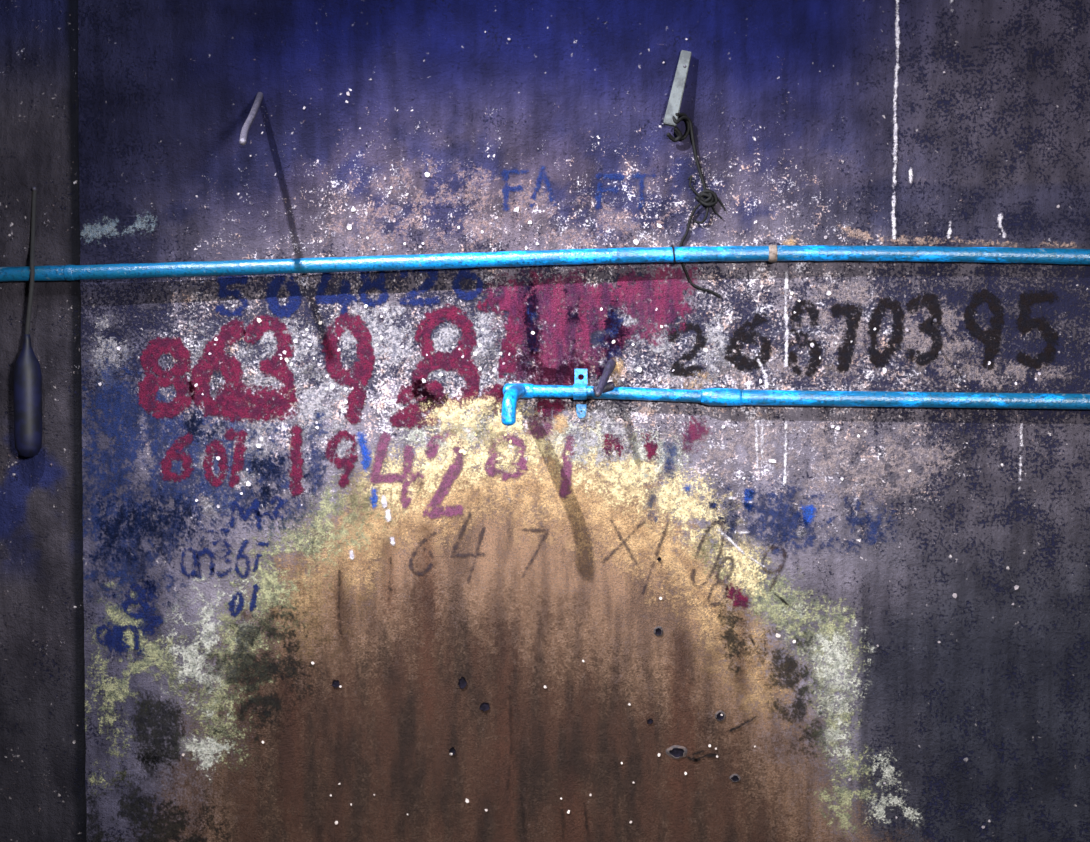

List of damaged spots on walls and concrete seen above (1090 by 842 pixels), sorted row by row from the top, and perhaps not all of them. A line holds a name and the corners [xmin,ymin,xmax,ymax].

water stain [85,405,920,842]